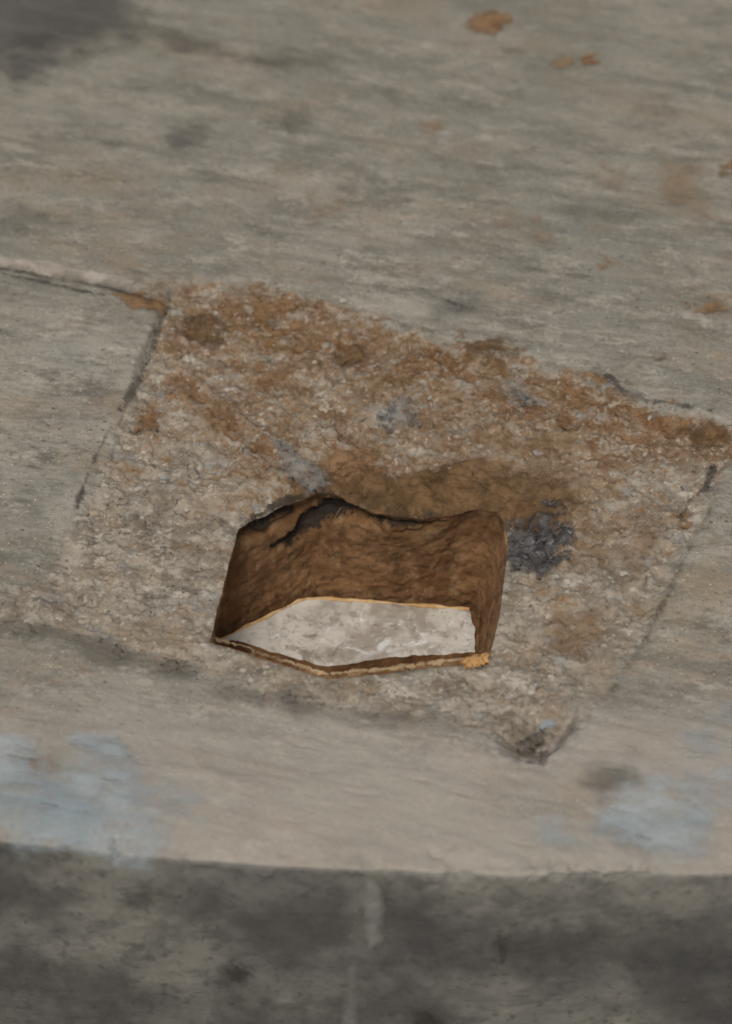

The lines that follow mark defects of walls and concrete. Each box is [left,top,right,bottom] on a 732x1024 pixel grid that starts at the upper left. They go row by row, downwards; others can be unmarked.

rust [467,10,513,35]
rust [112,290,168,316]
spalling [0,281,732,761]